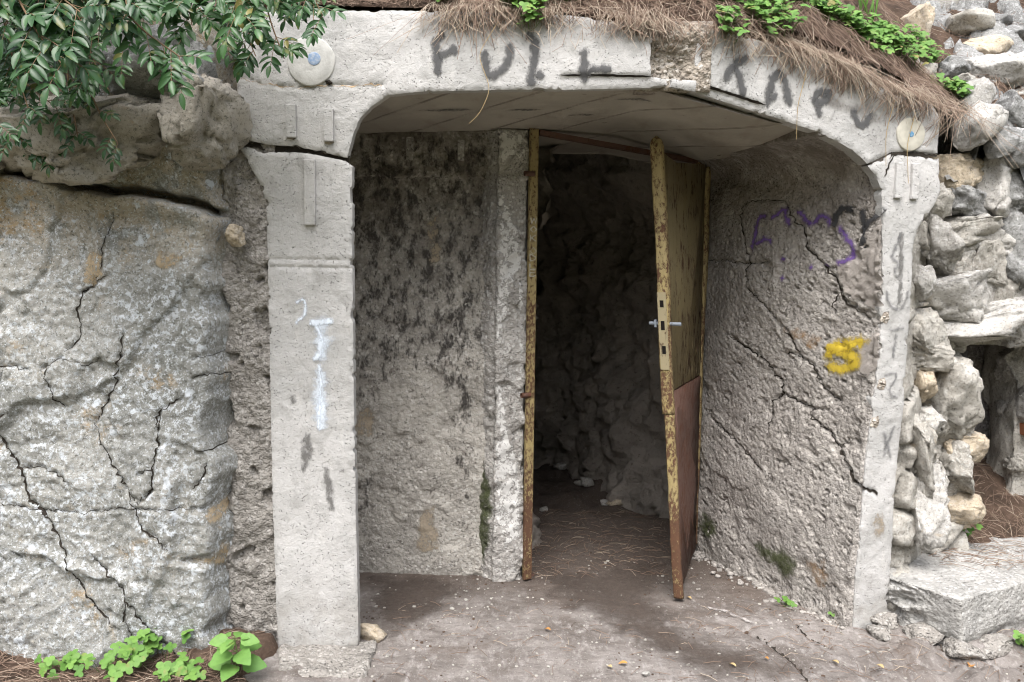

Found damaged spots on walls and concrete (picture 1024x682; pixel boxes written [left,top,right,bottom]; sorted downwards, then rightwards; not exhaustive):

crack [0,217,227,654]
leakage [352,133,486,425]
crack [709,199,878,495]